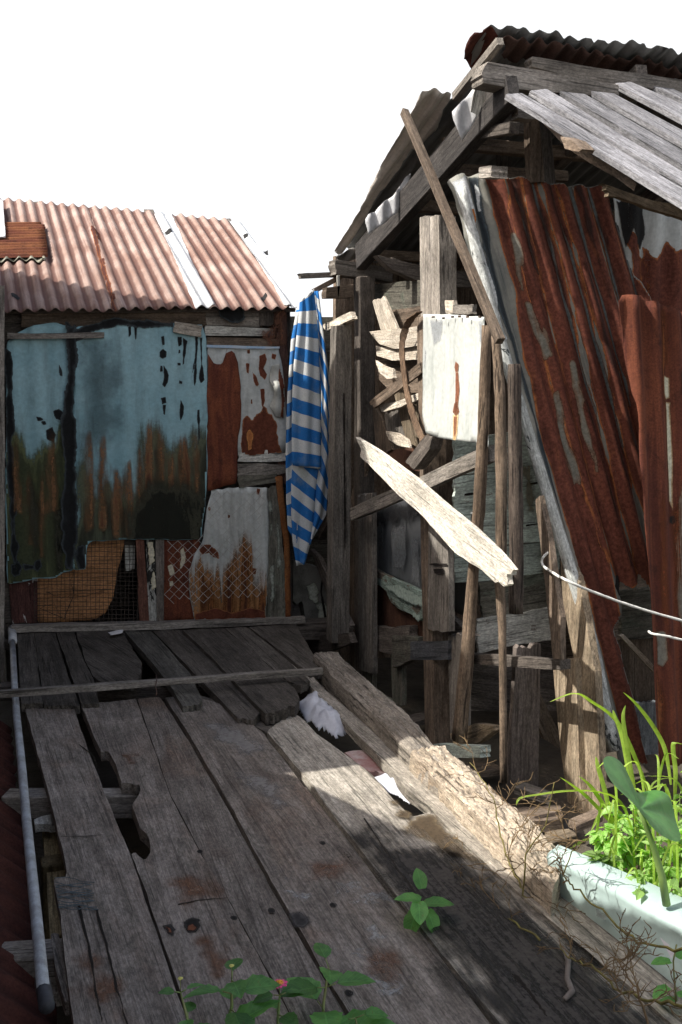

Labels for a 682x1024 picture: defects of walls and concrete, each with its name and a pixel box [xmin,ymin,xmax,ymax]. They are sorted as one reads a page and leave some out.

corrosion [13,445,57,556]
leakage [6,424,207,583]
corrosion [85,349,282,538]
corrosion [164,536,267,621]
corrosion [485,177,682,764]